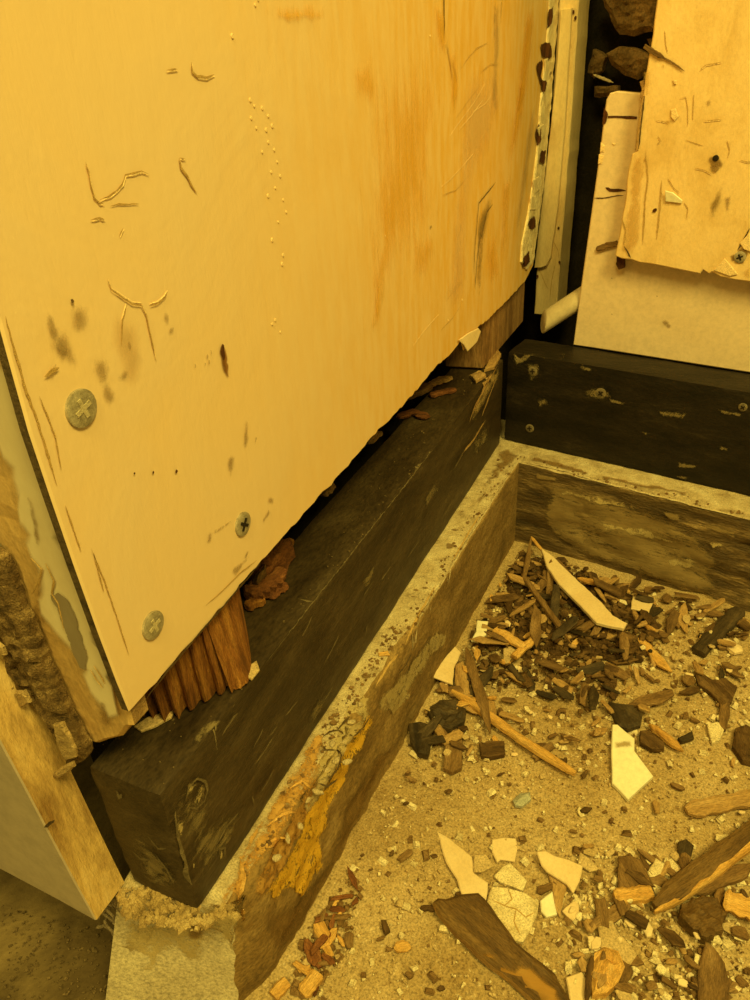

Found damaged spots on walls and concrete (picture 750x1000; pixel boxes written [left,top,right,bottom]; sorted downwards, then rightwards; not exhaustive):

peeling [0,367,117,723]
spalling [306,695,368,803]
crack [319,716,370,787]